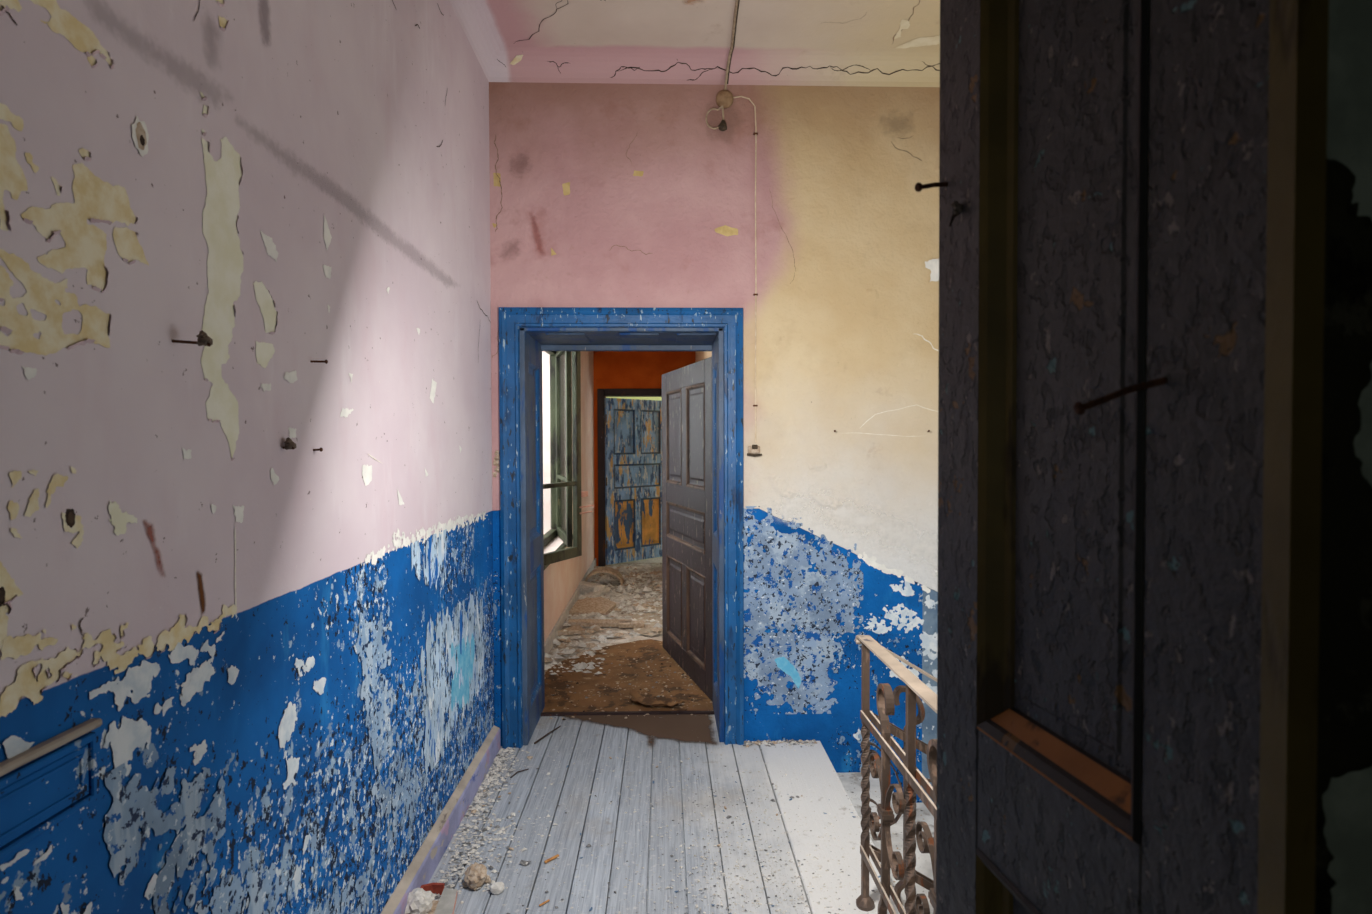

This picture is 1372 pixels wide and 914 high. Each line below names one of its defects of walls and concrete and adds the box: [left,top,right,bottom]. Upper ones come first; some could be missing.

crack [497,0,568,73]
crack [610,0,940,81]
peeling [0,103,149,380]
peeling [200,92,297,461]
spalling [925,258,939,283]
peeling [8,467,84,549]
peeling [361,511,488,589]
peeling [743,506,938,714]
peeling [0,561,310,914]
peeling [295,656,326,695]
peeling [354,591,484,837]
peeling [330,863,377,914]